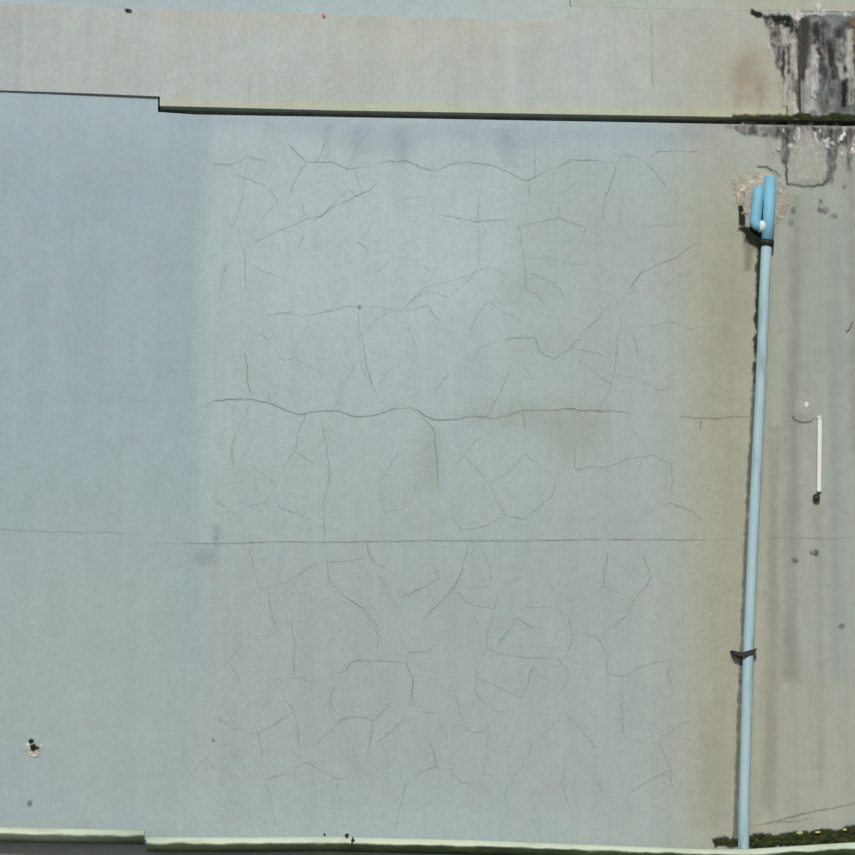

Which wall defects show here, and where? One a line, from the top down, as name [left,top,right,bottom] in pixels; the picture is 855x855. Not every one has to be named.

peeling [773,22,799,105]
peeling [812,23,855,107]
peeling [773,127,855,180]
spalling [732,170,788,226]